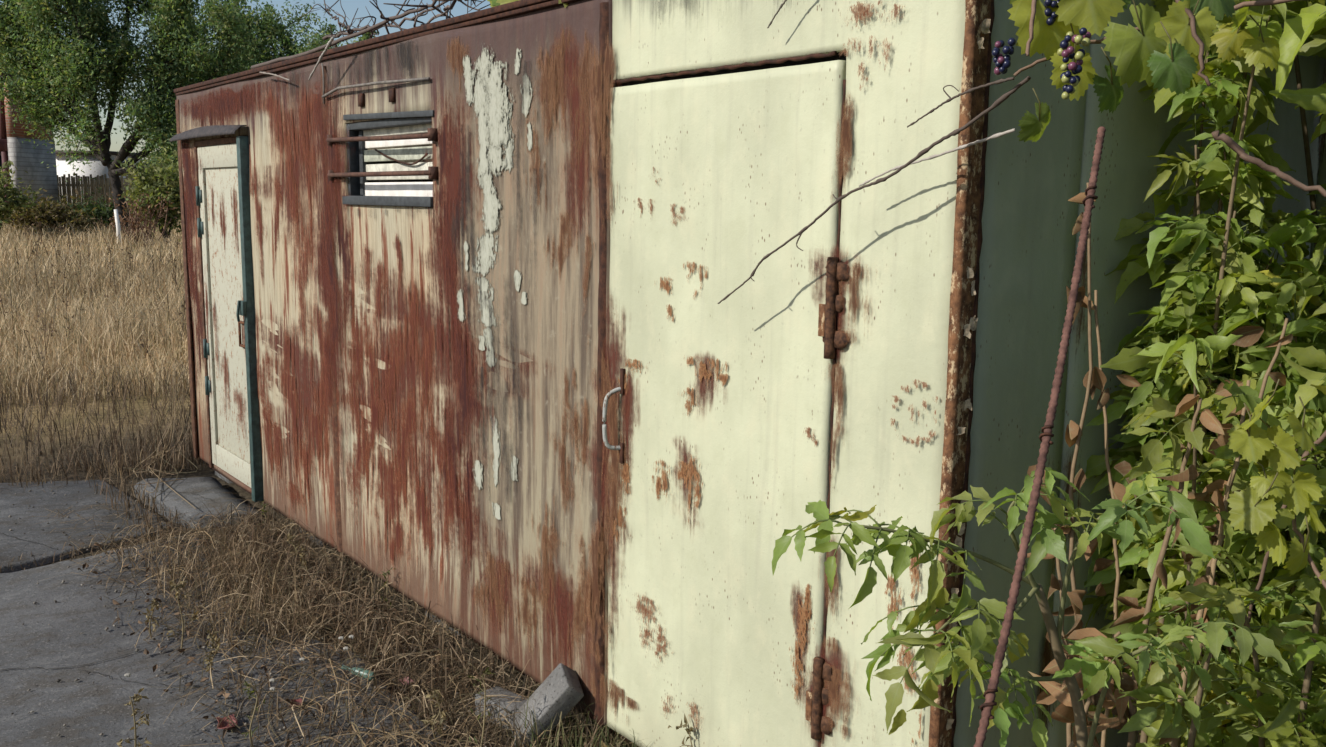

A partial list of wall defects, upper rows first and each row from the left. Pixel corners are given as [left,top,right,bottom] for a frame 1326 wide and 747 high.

rust [446,37,468,91]
peeling [457,43,533,367]
rust [526,1,903,522]
rust [181,79,642,719]
peeling [472,414,519,490]
rust [634,595,672,663]
rust [661,696,702,732]
rust [789,539,850,747]